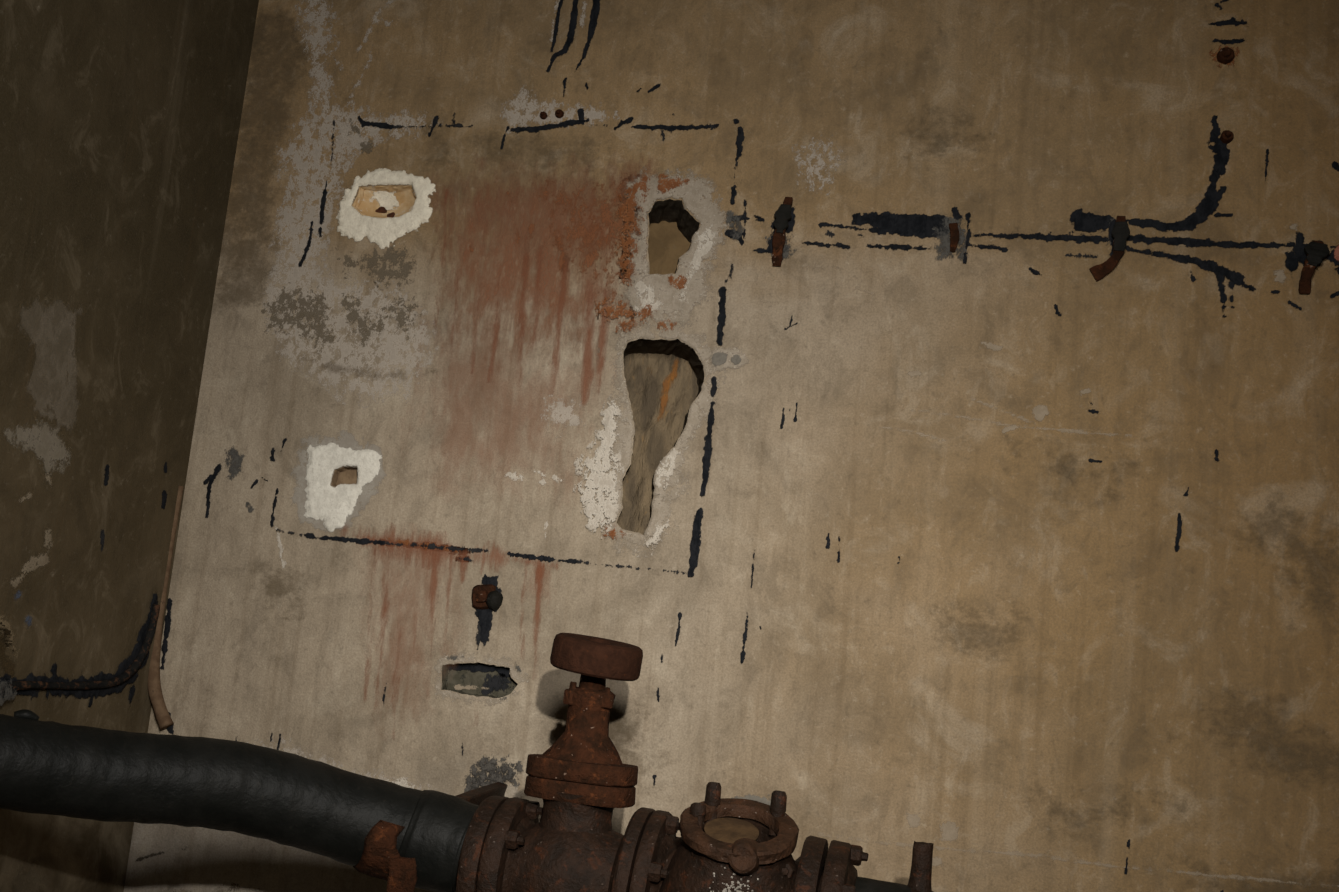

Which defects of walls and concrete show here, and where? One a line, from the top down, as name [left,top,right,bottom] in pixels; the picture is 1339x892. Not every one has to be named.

spalling [573,168,730,558]
crack [275,526,287,568]
corrosion [367,532,458,598]